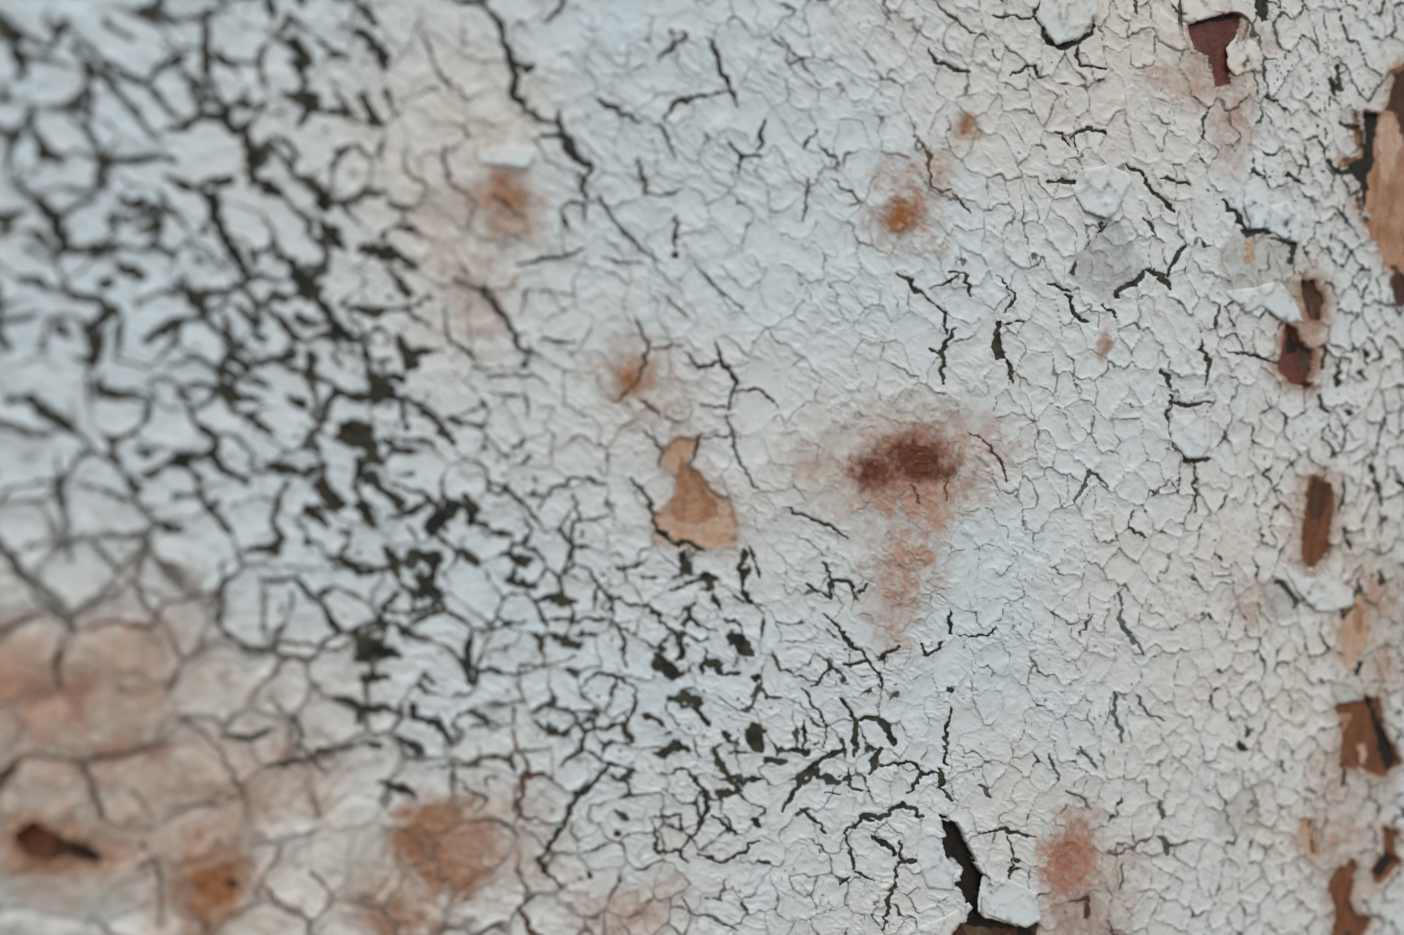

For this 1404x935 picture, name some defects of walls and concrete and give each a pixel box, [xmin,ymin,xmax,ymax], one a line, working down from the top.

crack [928,0,1107,79]
peeling [1153,0,1263,87]
rust [877,163,941,234]
crack [896,163,1191,385]
peeling [1339,63,1404,307]
crack [402,0,1037,935]
rust [799,408,992,642]
crack [1151,339,1276,514]
peeling [1274,475,1401,777]
rust [365,799,523,935]
peeling [908,814,1118,935]
rust [1036,814,1116,915]